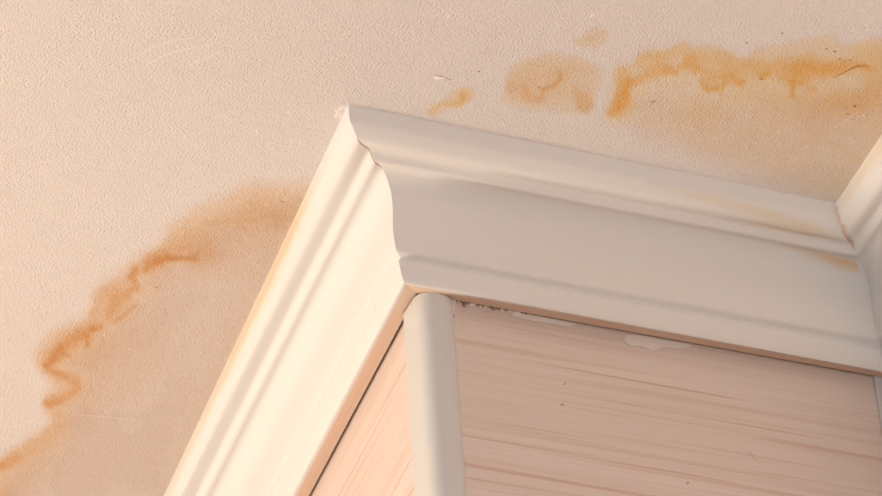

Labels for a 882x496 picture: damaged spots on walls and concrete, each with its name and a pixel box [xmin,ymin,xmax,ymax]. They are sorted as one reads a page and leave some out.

damp [424,85,477,119]
damp [500,27,882,203]
damp [0,175,313,496]